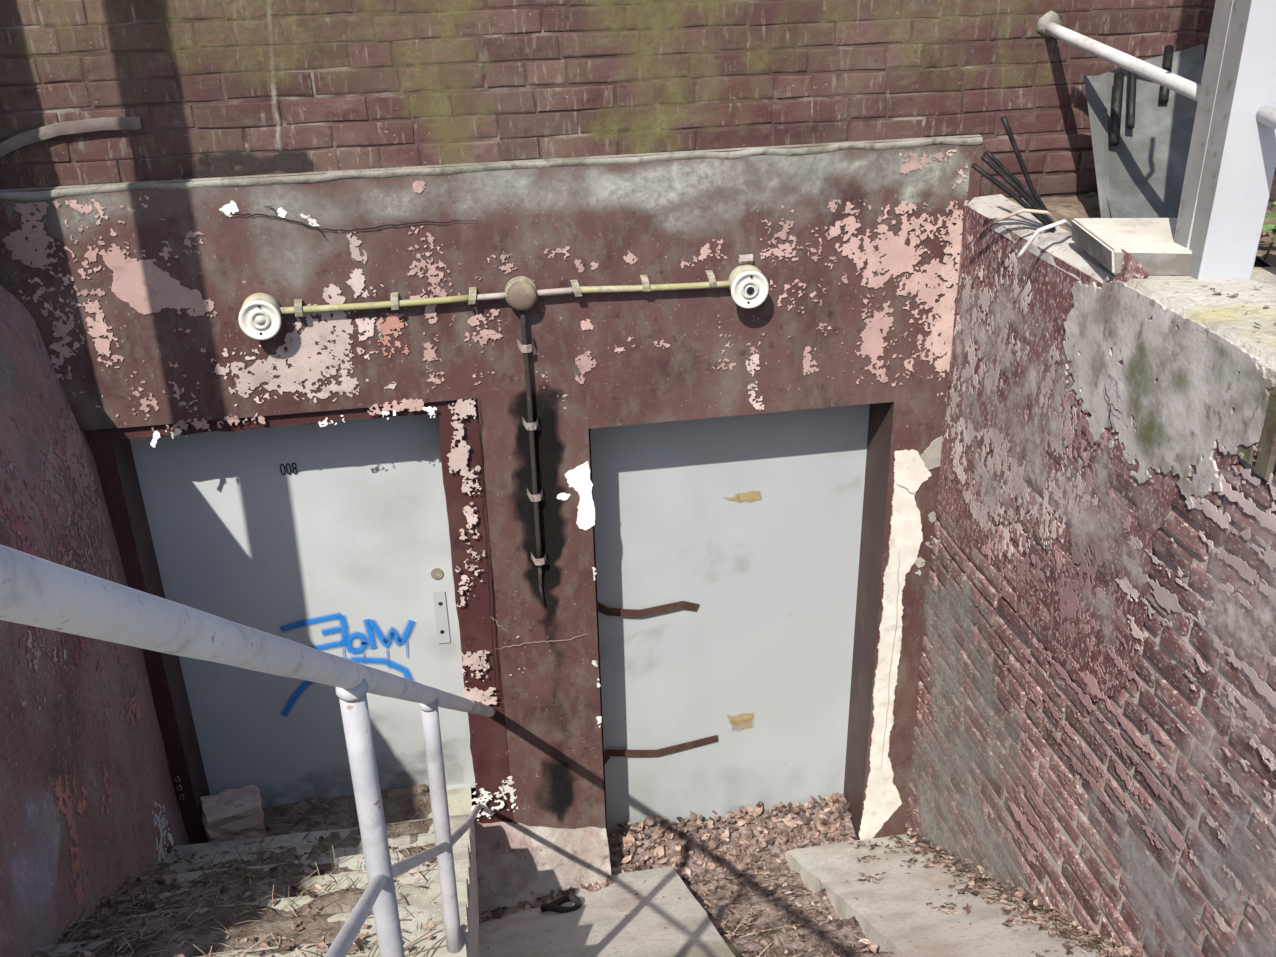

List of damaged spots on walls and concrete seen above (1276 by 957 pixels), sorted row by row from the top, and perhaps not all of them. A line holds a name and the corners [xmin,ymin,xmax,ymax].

crack [221,205,459,239]
peeling [412,181,426,193]
peeling [487,254,517,274]
peeling [3,196,460,448]
peeling [464,307,503,353]
peeling [712,314,767,410]
peeling [0,409,116,581]
peeling [367,372,495,607]
leakage [511,391,564,628]
flaking render [760,150,1276,933]
peeling [0,625,103,682]
leakage [544,764,572,820]